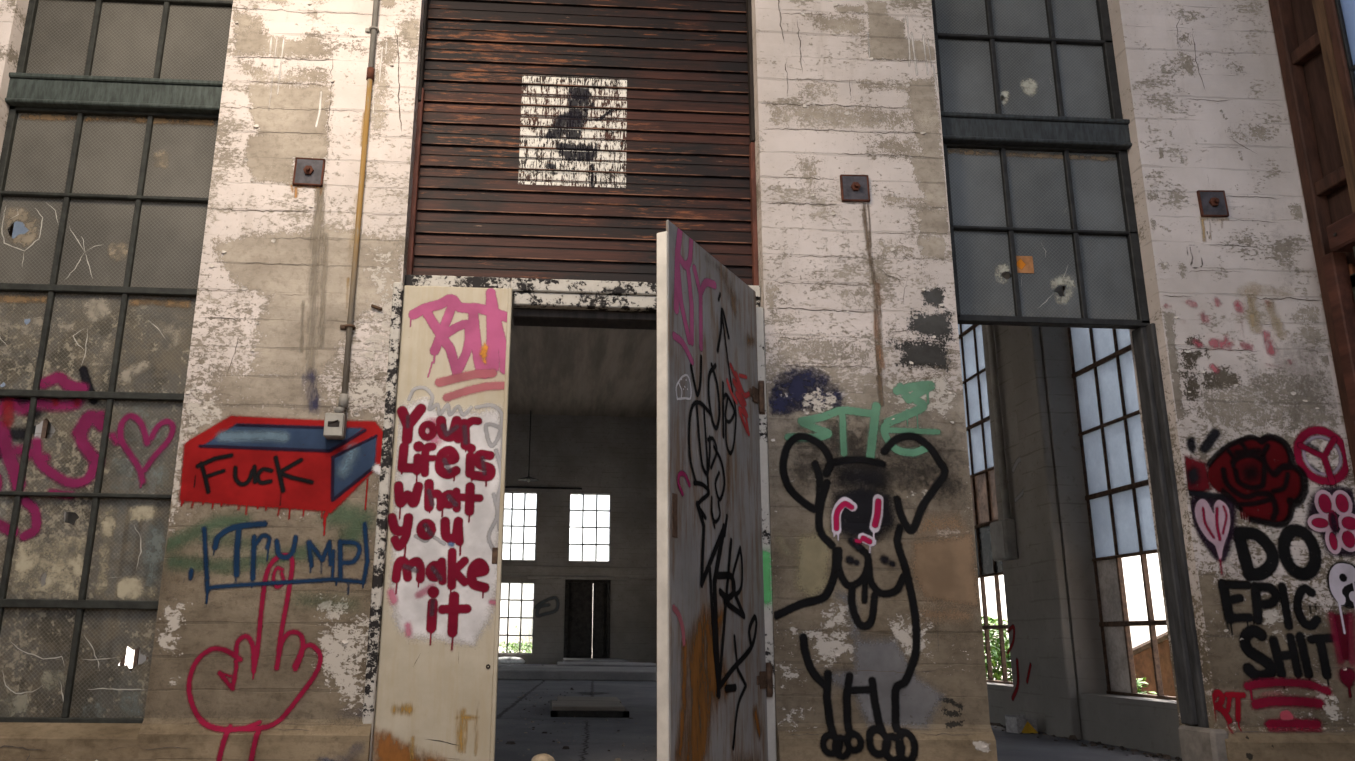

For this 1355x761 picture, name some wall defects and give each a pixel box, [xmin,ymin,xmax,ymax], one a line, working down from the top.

peeling [229,0,419,187]
corrosion [840,174,884,407]
corrosion [1196,190,1229,241]
peeling [145,188,404,740]